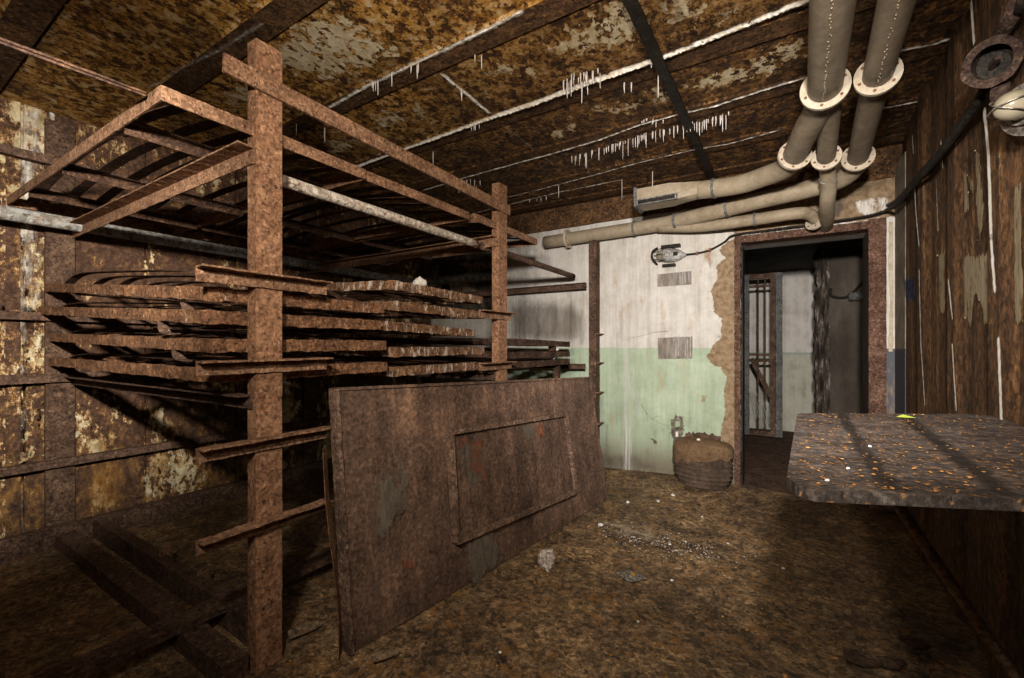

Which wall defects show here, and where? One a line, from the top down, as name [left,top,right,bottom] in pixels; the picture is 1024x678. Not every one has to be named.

leakage [329,10,523,108]
leakage [403,0,809,157]
leakage [461,77,806,204]
peeling [705,195,820,467]
peeling [834,177,895,352]
peeling [937,249,946,315]
peeling [964,150,984,240]
peeling [964,251,988,328]
peeling [1014,182,1023,325]